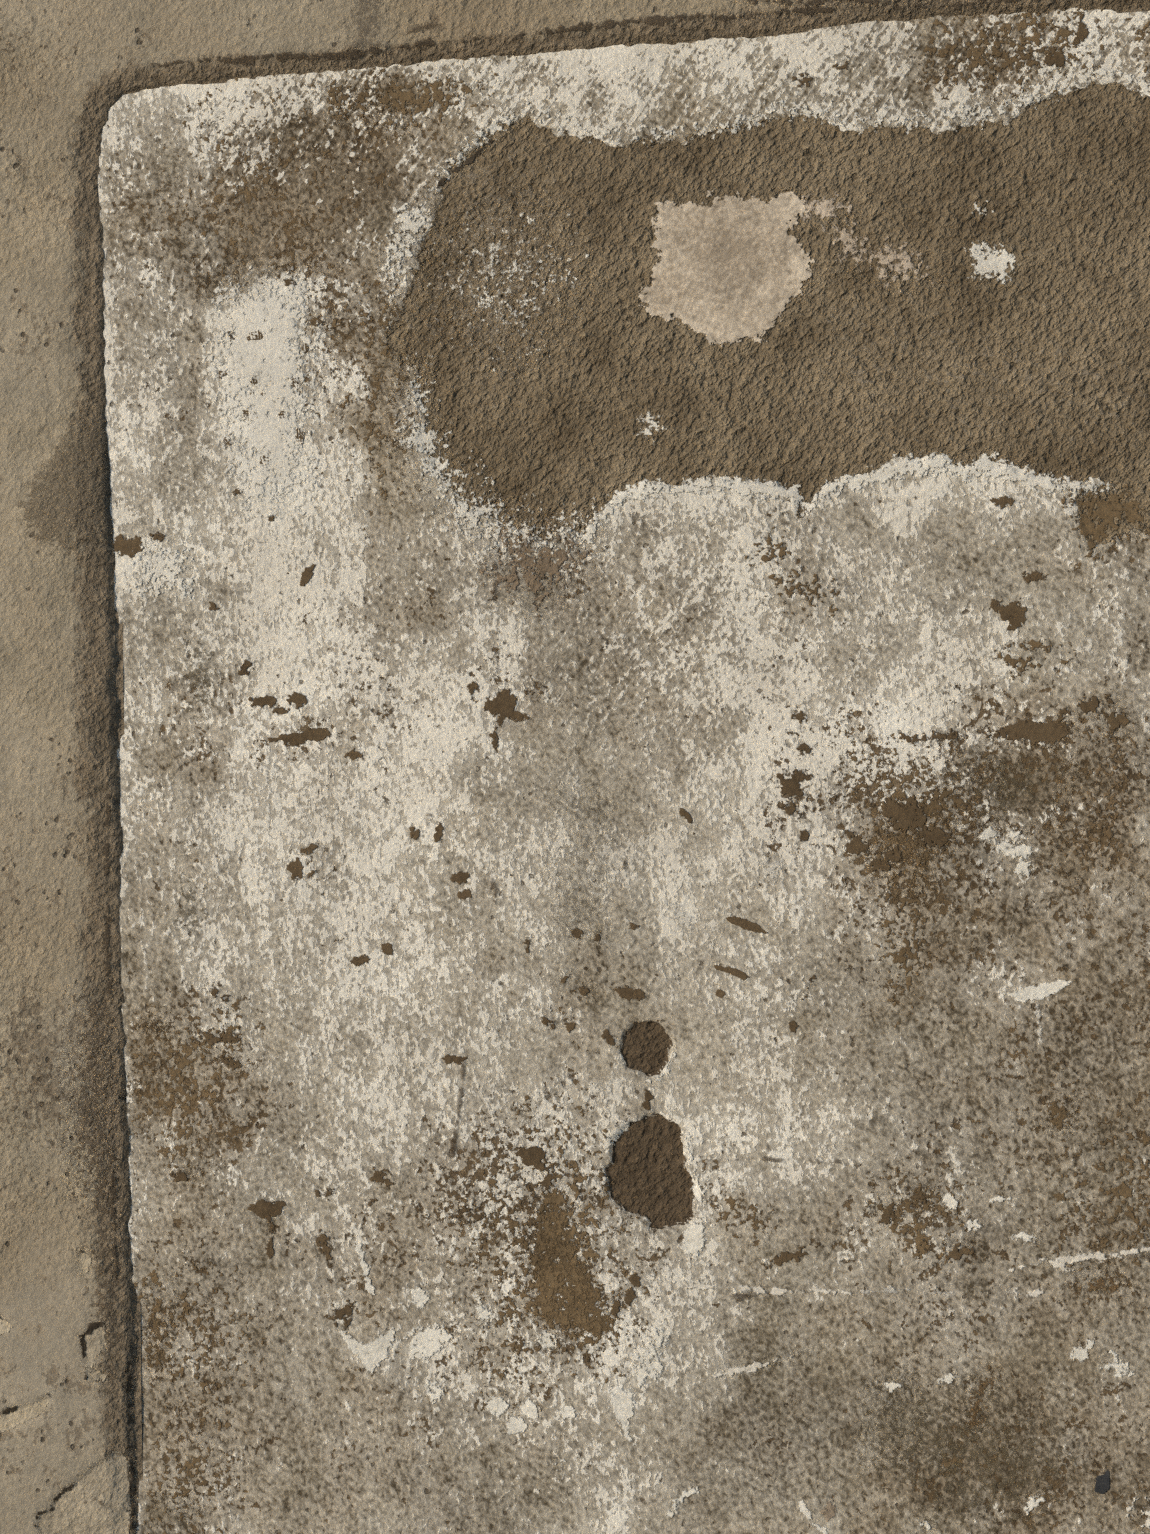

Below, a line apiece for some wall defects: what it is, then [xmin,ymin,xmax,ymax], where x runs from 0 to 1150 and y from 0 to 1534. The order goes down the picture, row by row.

spalling [376,7,1150,620]
peeling [191,266,333,528]
peeling [113,531,203,611]
peeling [300,564,316,586]
peeling [989,566,1080,682]
peeling [467,682,543,749]
peeling [541,1016,576,1033]
peeling [561,971,589,996]
peeling [613,985,645,1001]
spalling [601,1021,706,1258]
peeling [537,1330,557,1350]
peeling [484,1396,575,1435]